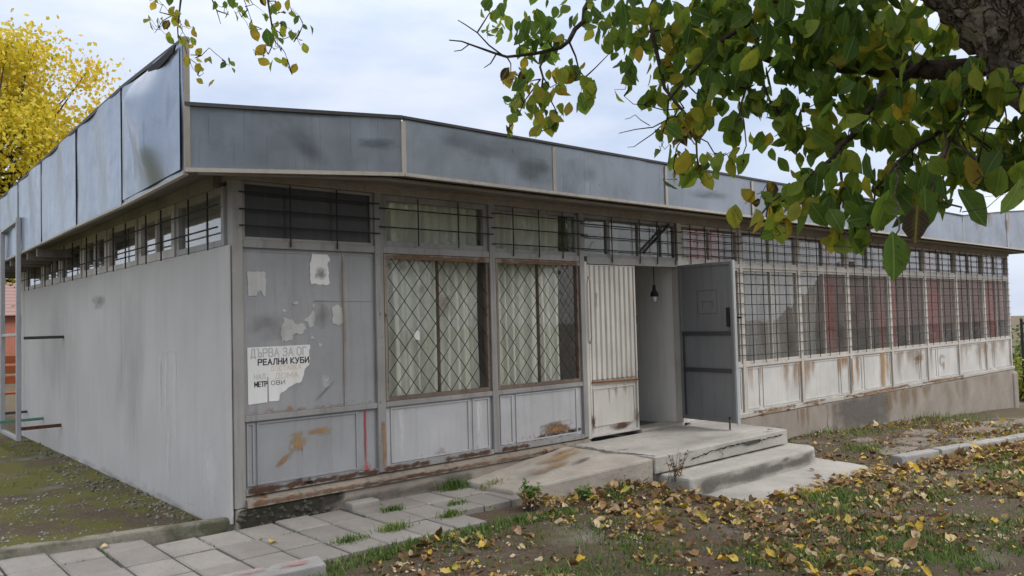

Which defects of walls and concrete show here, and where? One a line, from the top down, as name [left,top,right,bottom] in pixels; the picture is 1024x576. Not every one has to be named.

rust [880,353,889,386]
rust [249,418,595,507]
crack [692,434,783,467]